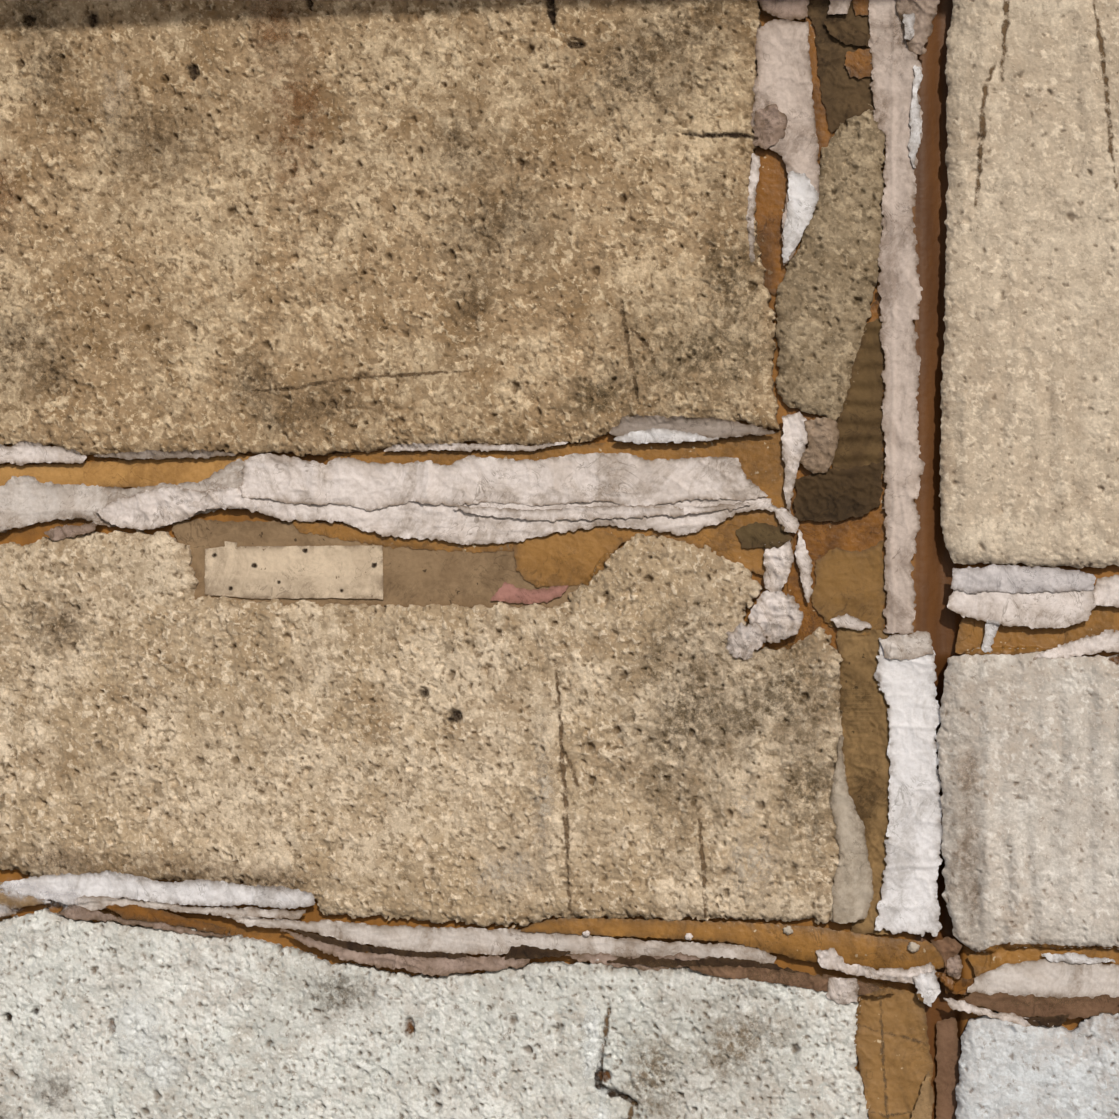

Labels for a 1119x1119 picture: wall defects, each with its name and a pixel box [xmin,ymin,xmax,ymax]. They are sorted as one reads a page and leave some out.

peeling [746,0,820,266]
crack [975,0,1010,205]
crack [1093,4,1118,189]
peeling [0,412,840,660]
peeling [828,0,944,937]
peeling [947,564,1119,665]
crack [555,673,579,916]
peeling [0,870,1119,1027]
crack [594,1003,638,1119]